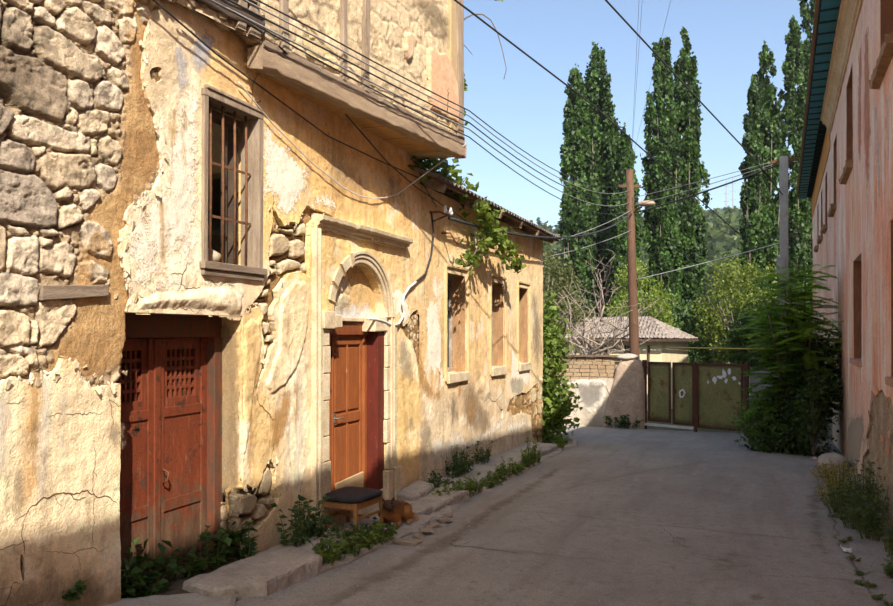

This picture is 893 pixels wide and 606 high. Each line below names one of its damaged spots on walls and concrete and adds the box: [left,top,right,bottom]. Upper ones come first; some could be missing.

spalling [0,0,214,395]
spalling [205,116,342,394]
crack [1,394,121,569]
spalling [220,456,283,563]
peeling [392,276,444,389]
spalling [507,350,543,443]
spalling [847,386,893,530]